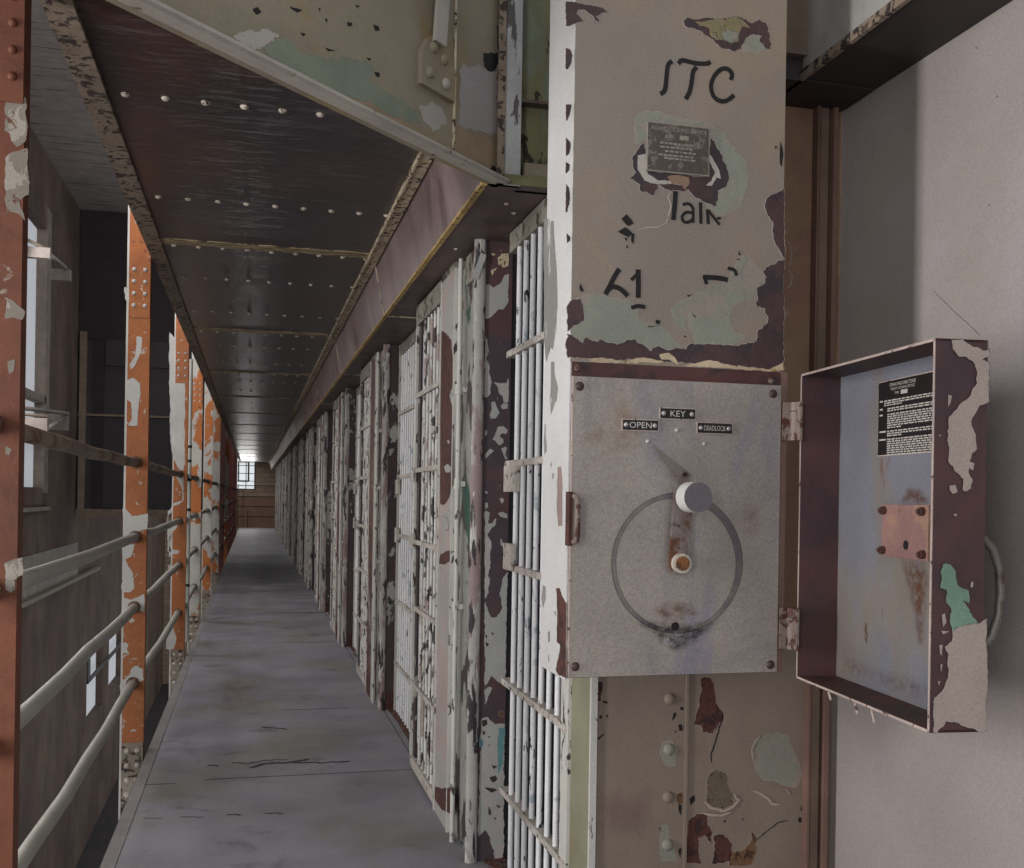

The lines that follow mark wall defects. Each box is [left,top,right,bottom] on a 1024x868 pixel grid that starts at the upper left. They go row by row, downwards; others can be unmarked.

peeling [4,97,29,220]
peeling [233,26,498,172]
peeling [683,16,772,52]
peeling [127,336,142,426]
peeling [440,331,453,531]
peeling [484,336,509,459]
peeling [543,188,793,526]
peeling [939,338,990,494]
peeling [121,508,148,613]
peeling [477,491,508,859]
crack [710,716,723,763]
peeling [932,563,989,733]